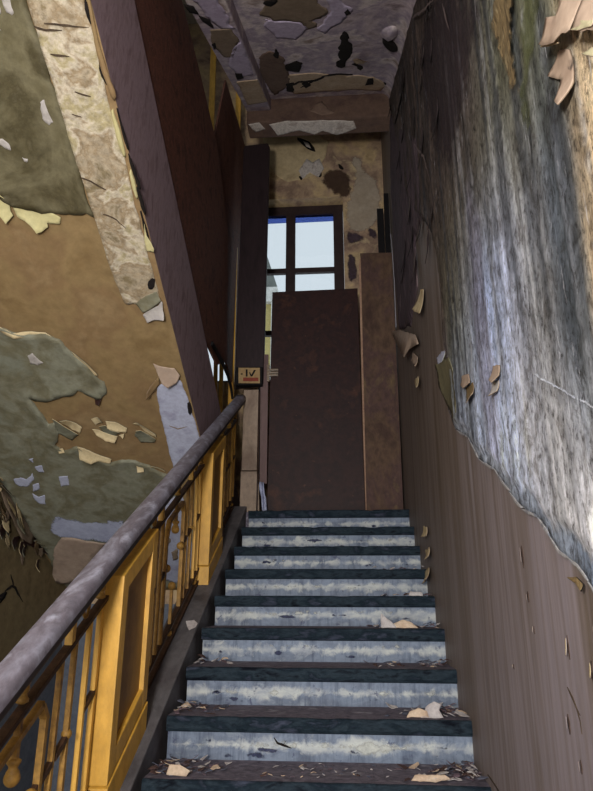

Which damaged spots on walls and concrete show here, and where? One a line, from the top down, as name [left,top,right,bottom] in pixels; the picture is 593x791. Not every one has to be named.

peeling [0,0,164,323]
leakage [323,157,381,243]
leakage [347,254,357,282]
peeling [249,0,593,596]
leakage [420,0,478,163]
peeling [0,327,199,589]
peeling [381,612,418,628]